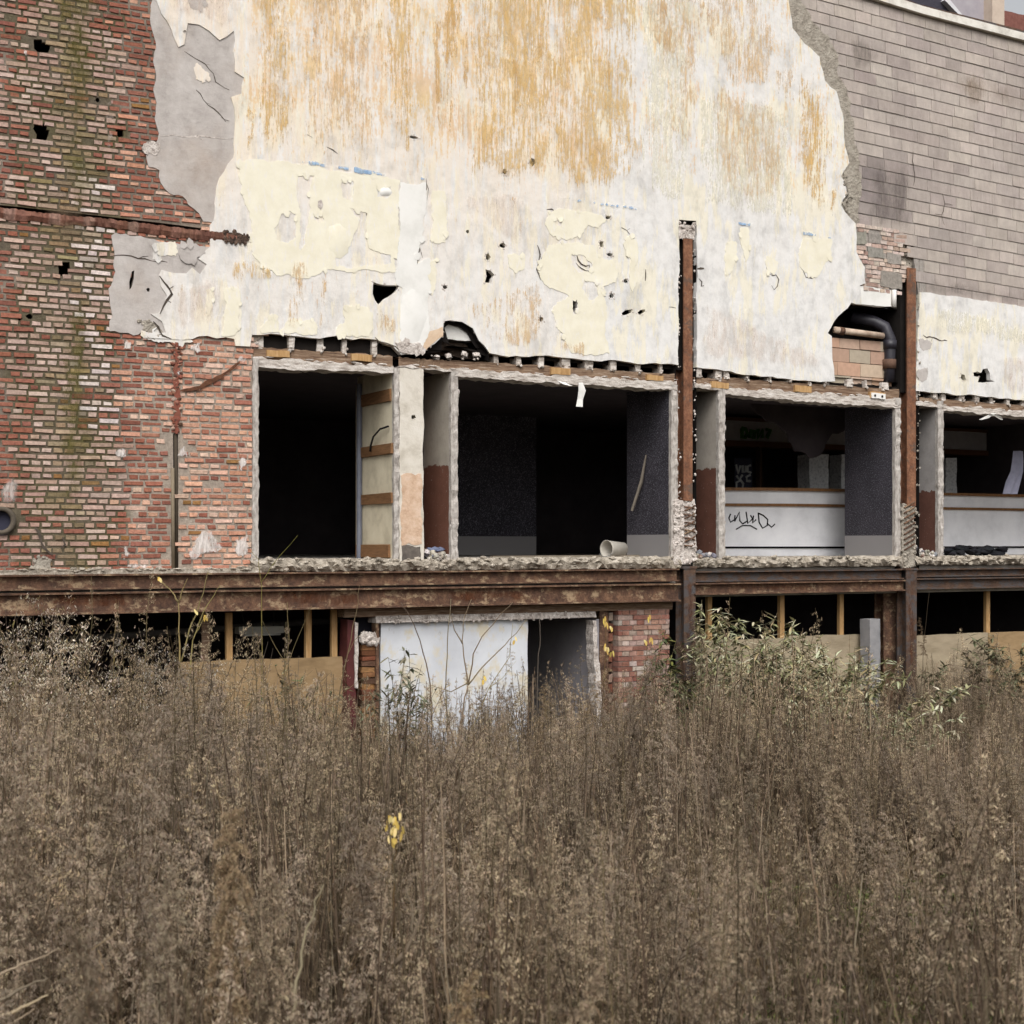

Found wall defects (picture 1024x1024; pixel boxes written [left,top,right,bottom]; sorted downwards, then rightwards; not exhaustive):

peeling [188,0,208,12]
peeling [194,63,211,83]
water stain [248,0,293,141]
water stain [308,0,839,213]
peeling [141,140,160,156]
spalling [842,172,853,217]
peeling [152,238,206,266]
peeling [537,208,629,356]
peeling [137,319,193,347]
peeling [206,286,242,337]
peeling [223,159,489,561]